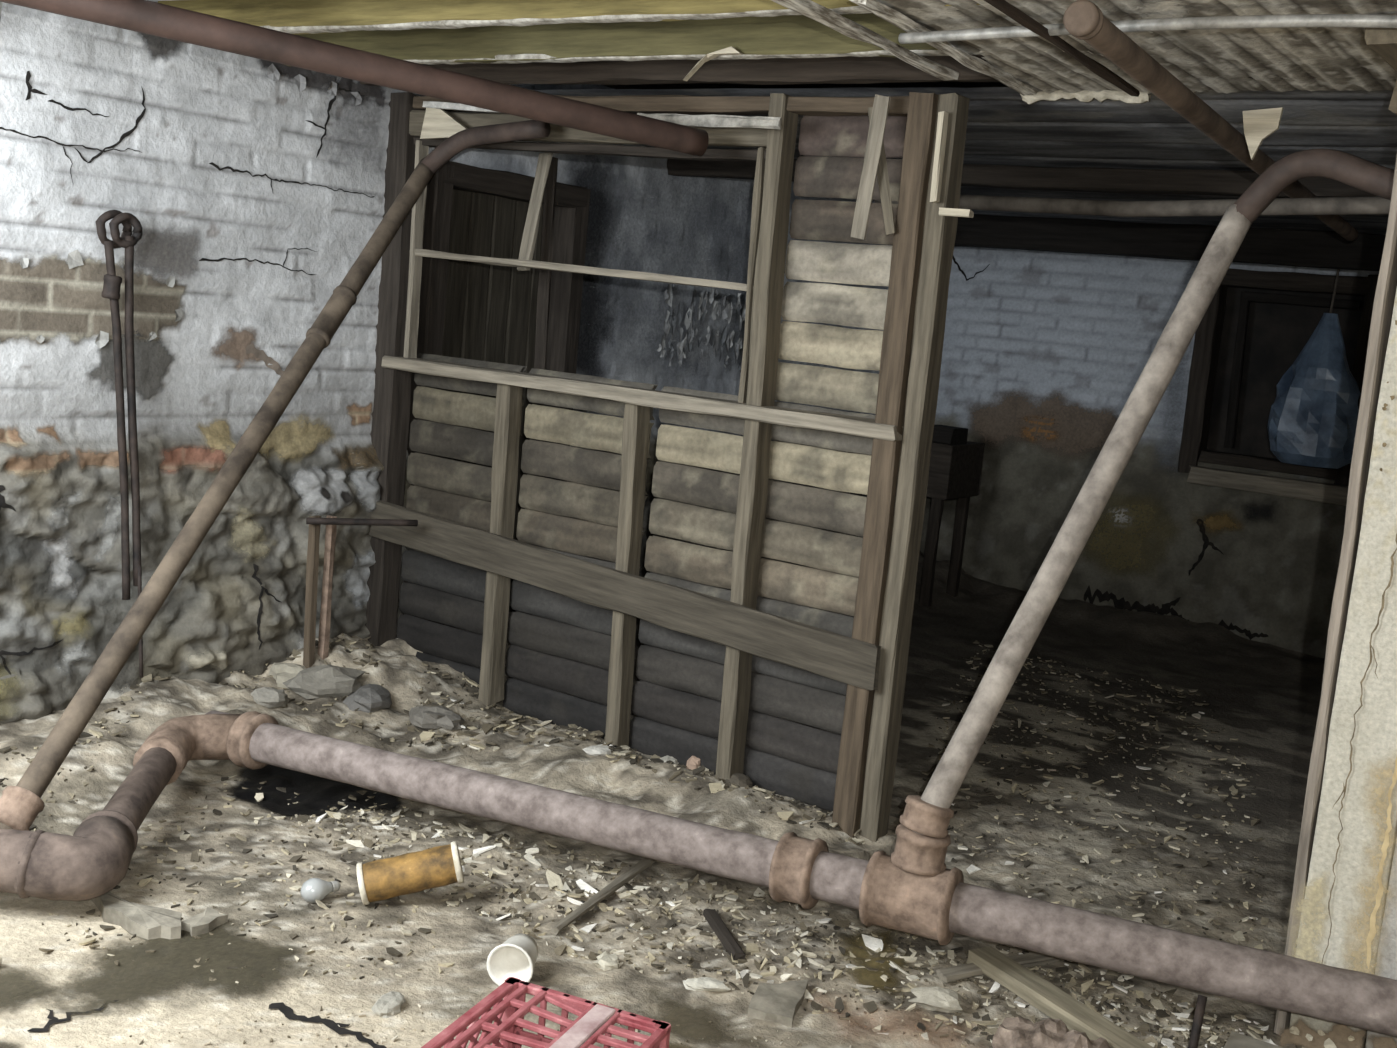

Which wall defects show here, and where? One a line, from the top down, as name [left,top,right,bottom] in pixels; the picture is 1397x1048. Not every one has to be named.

crack [0,71,146,182]
crack [209,83,374,198]
peeling [0,231,198,400]
flaking render [0,426,130,476]
flaking render [159,446,226,473]
flaking render [347,403,372,426]
crack [1321,534,1397,964]
corrosion [1350,757,1397,974]
damp [0,922,301,1014]
crack [268,1002,387,1048]